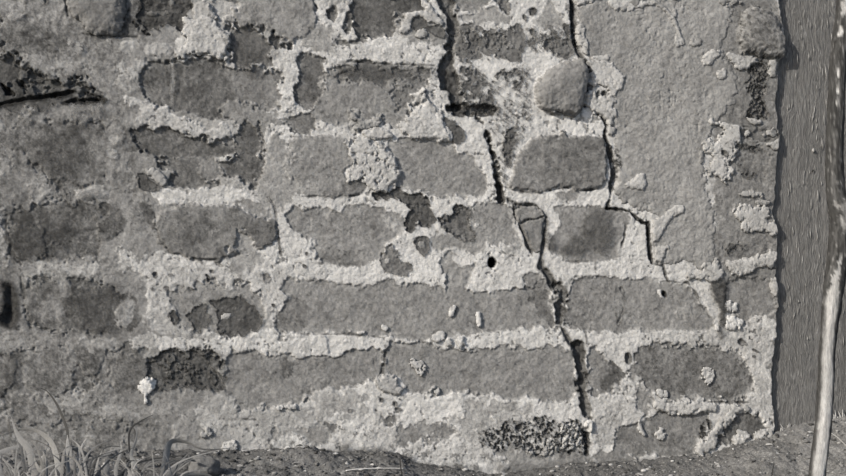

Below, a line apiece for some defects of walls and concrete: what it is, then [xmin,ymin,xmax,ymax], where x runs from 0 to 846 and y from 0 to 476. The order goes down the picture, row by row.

flaking render [132,0,231,61]
peeling [399,0,626,183]
flaking render [572,0,780,184]
flaking render [344,87,476,257]
crack [569,0,709,317]
peeling [379,243,413,276]
crack [437,0,593,456]
flaking render [686,243,779,296]
peeling [167,295,263,337]
spalling [138,347,227,404]
spalling [479,415,593,458]
flaking render [653,389,773,456]